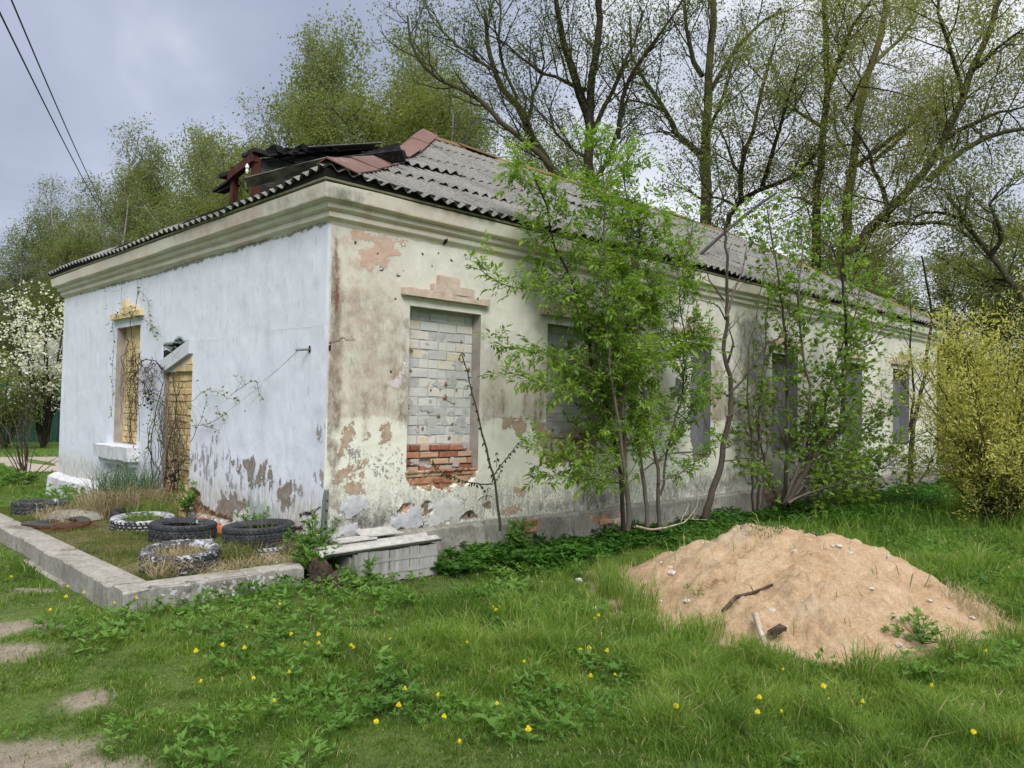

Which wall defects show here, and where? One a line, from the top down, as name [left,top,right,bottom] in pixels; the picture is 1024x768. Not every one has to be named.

peeling [350,228,409,277]
damp [328,287,342,426]
peeling [188,435,311,532]
flaking render [313,421,478,527]
peeling [502,415,547,449]